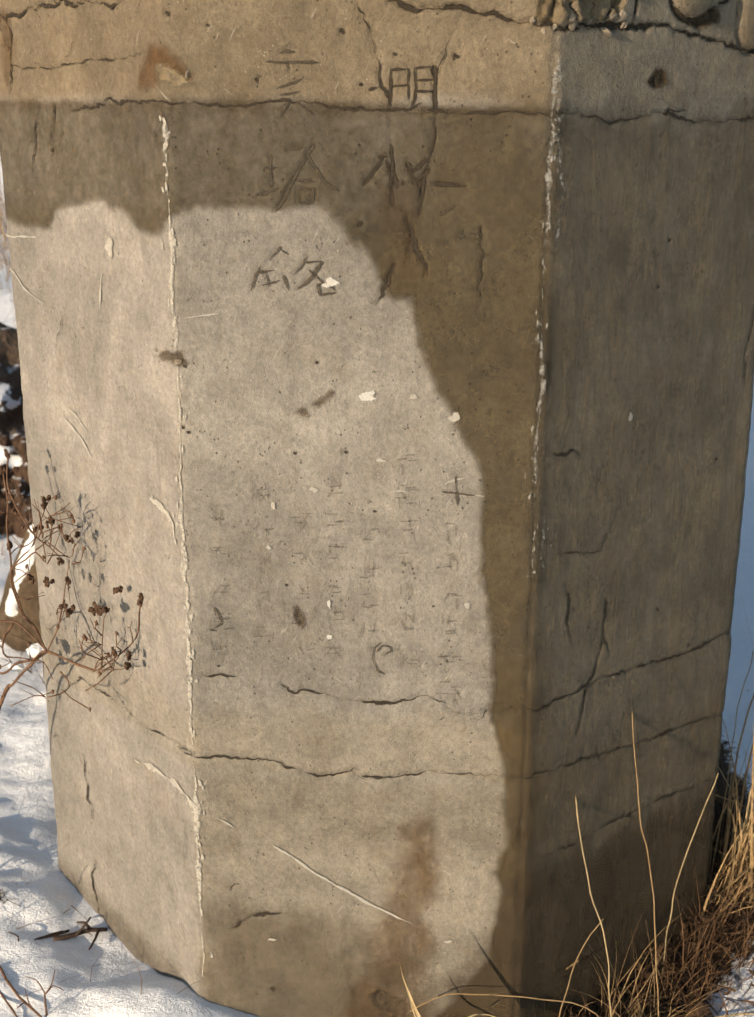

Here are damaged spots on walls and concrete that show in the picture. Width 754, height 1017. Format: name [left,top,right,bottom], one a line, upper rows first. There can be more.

crack [0,0,141,92]
corrosion [140,47,184,85]
spalling [529,0,628,36]
spalling [685,7,720,29]
crack [29,0,754,309]
water stain [0,101,609,1017]
water stain [513,103,754,999]
crack [566,591,575,639]
crack [203,671,236,679]
crack [281,599,728,731]
crack [67,677,719,780]